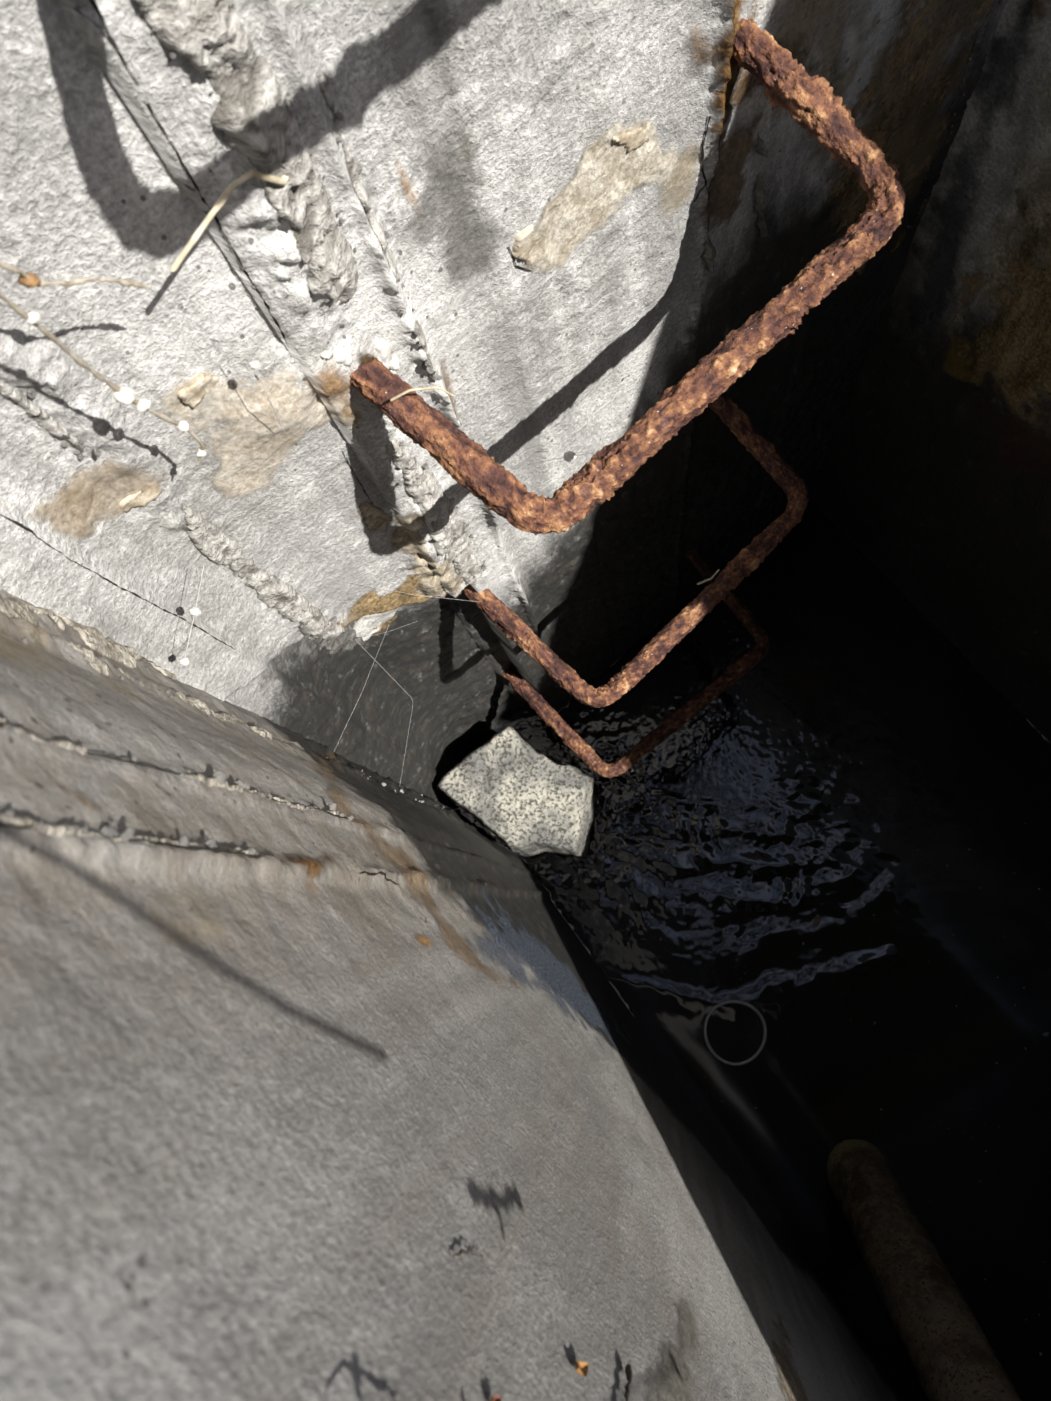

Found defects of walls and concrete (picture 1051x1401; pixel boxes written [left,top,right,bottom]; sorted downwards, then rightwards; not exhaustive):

rust [697,0,761,226]
crack [73,0,289,347]
water stain [774,0,1051,428]
rust [444,370,456,413]
crack [87,752,182,775]
crack [0,822,32,830]
crack [264,795,354,820]
crack [128,839,266,859]
crack [360,872,399,885]
water stain [772,1318,807,1401]